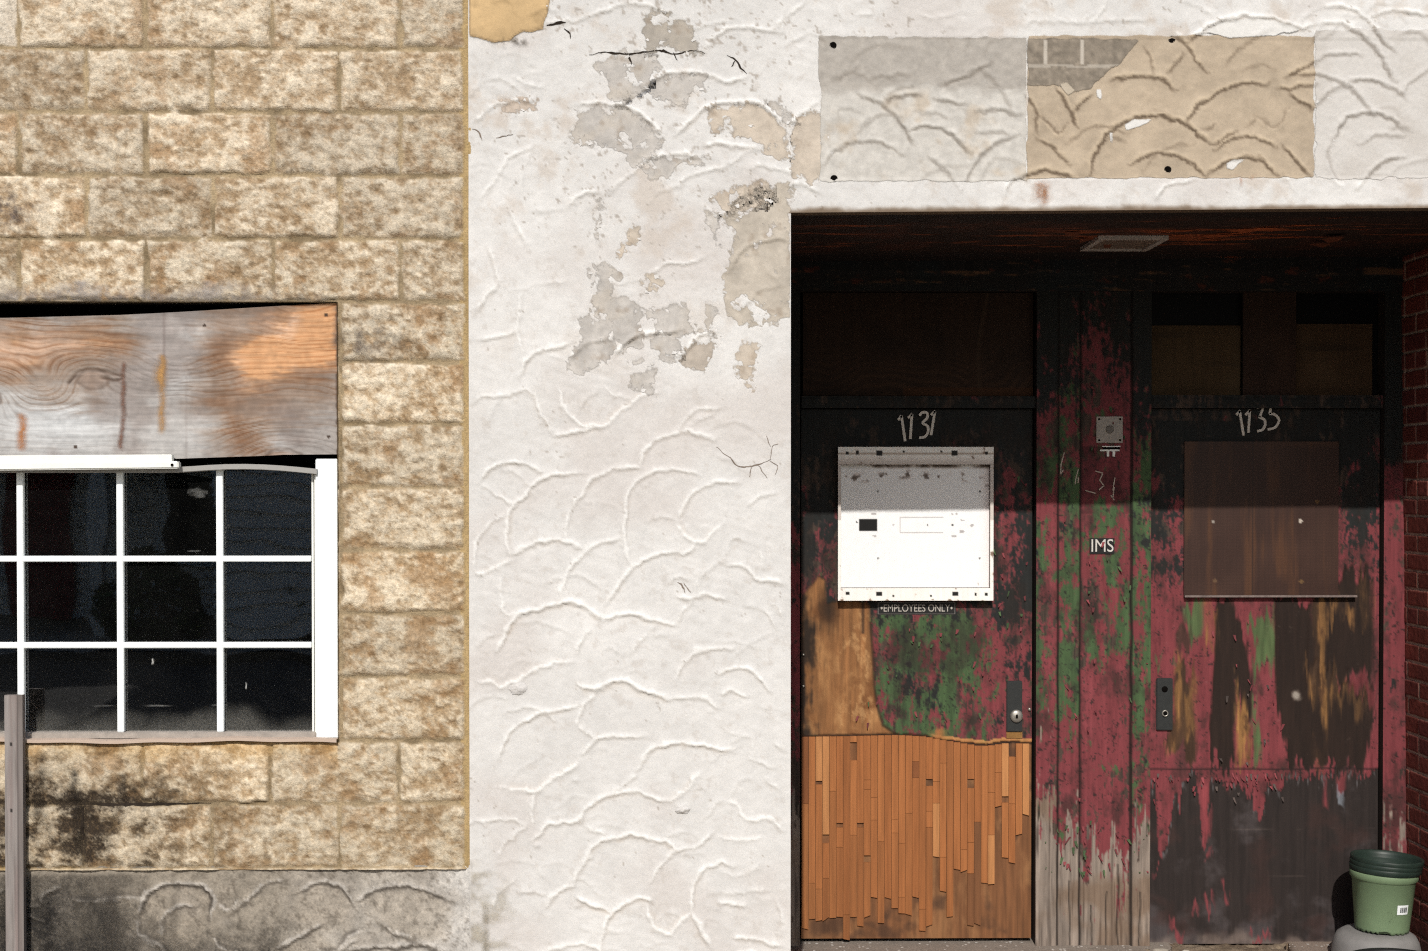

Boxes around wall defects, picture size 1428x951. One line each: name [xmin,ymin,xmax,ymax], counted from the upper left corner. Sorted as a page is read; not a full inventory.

spalling [469,0,550,42]
peeling [567,10,834,395]
water stain [26,758,179,951]